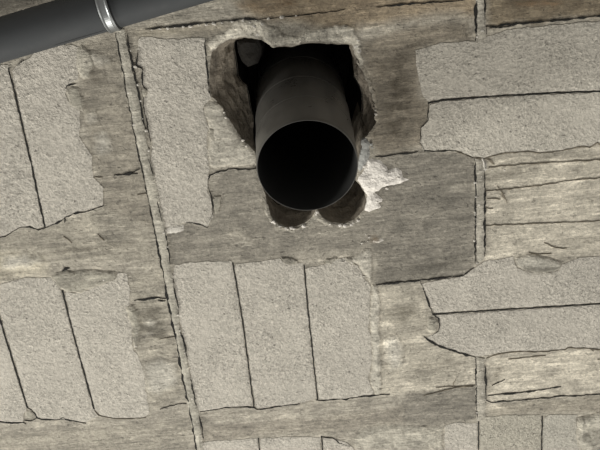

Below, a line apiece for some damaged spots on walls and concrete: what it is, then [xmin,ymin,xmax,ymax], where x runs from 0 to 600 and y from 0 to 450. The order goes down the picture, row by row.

spalling [204,18,379,168]
crack [0,205,104,243]
crack [93,33,298,450]
peeling [281,257,299,265]
spalling [263,175,367,233]
peeling [322,234,383,283]
crack [376,104,600,419]
crack [0,408,146,424]
crack [317,393,390,401]
spalling [353,424,445,450]